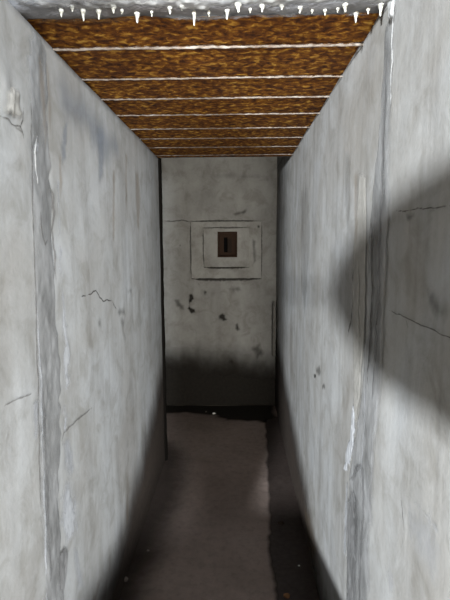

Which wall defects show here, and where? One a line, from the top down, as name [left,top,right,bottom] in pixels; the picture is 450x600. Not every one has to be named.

leakage [18,0,348,10]